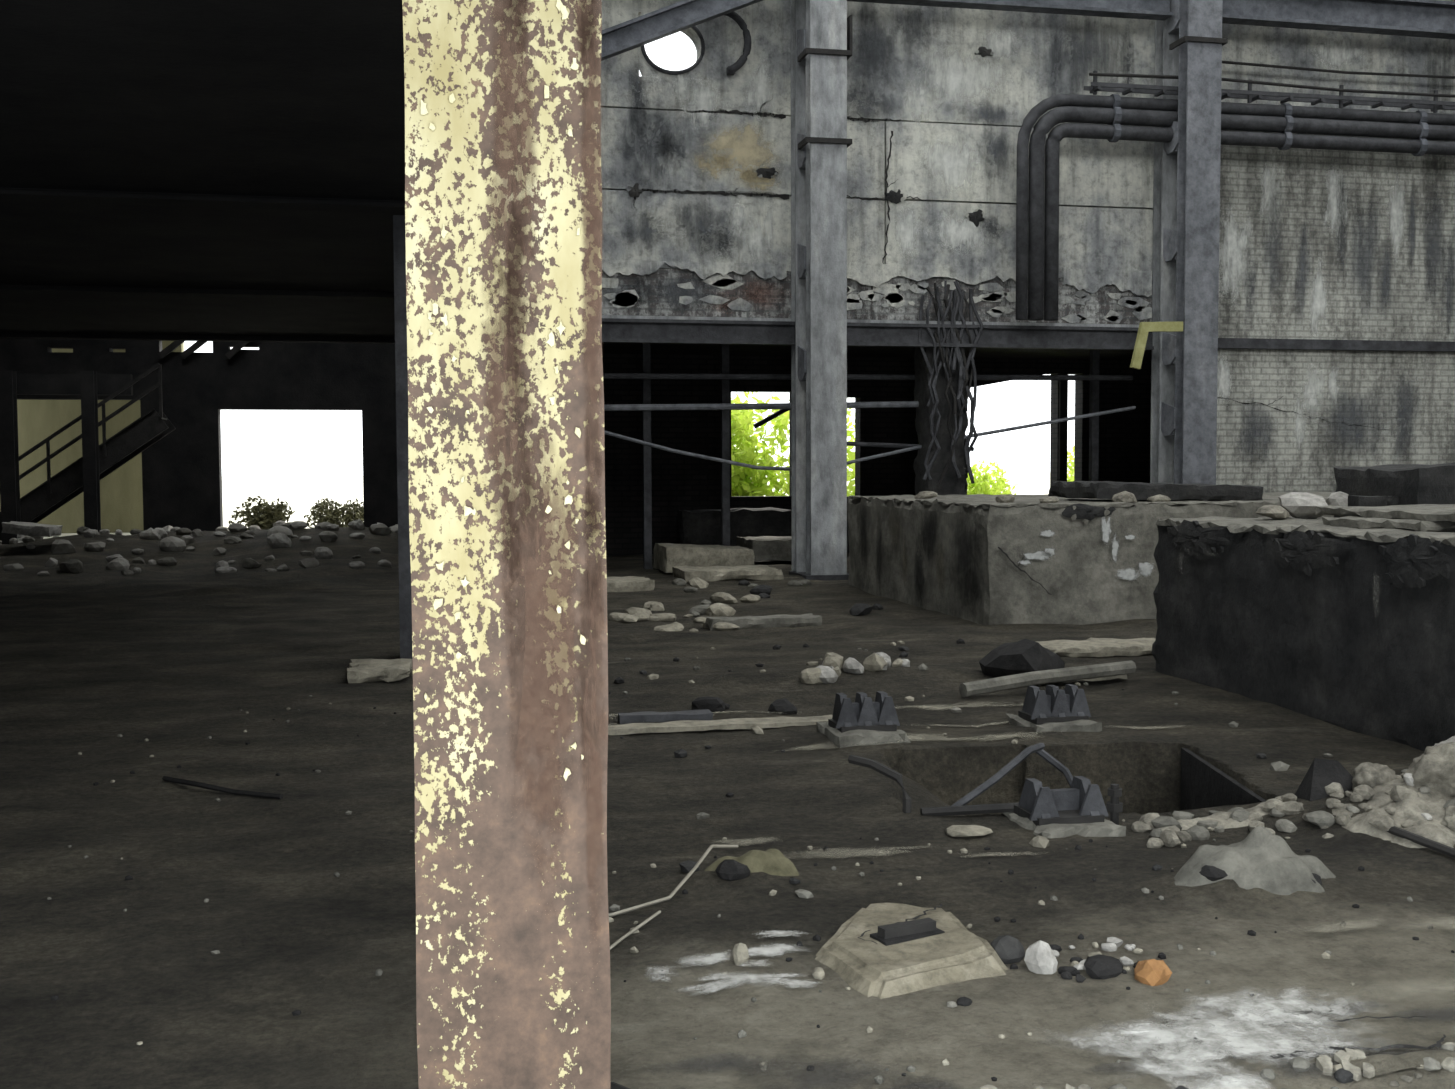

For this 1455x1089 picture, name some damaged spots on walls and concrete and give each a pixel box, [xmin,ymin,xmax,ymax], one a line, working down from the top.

damp [630,70,646,122]
damp [661,65,775,190]
damp [908,33,1014,120]
peeling [602,259,787,311]
peeling [847,263,1016,318]
damp [940,220,984,247]
damp [1223,169,1279,307]
damp [1297,230,1326,330]
damp [1326,174,1454,334]
corrosion [487,0,604,879]
damp [1217,359,1230,397]
damp [1296,370,1413,454]